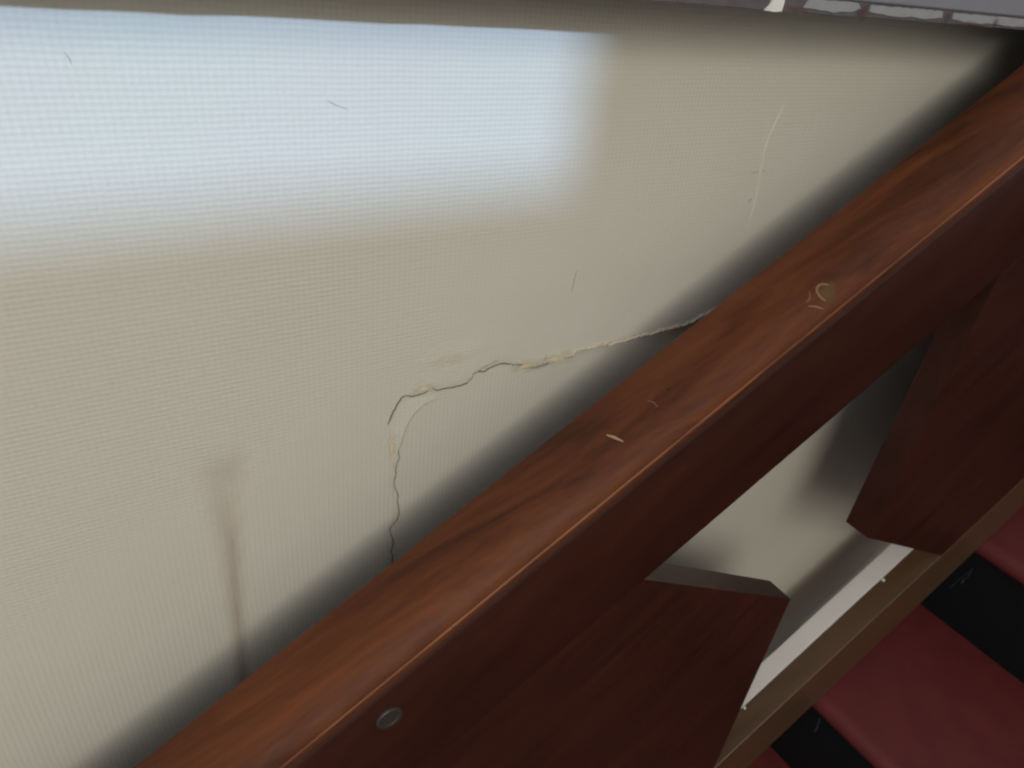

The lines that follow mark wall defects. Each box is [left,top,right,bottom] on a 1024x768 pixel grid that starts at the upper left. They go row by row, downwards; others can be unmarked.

crack [364,354,573,579]